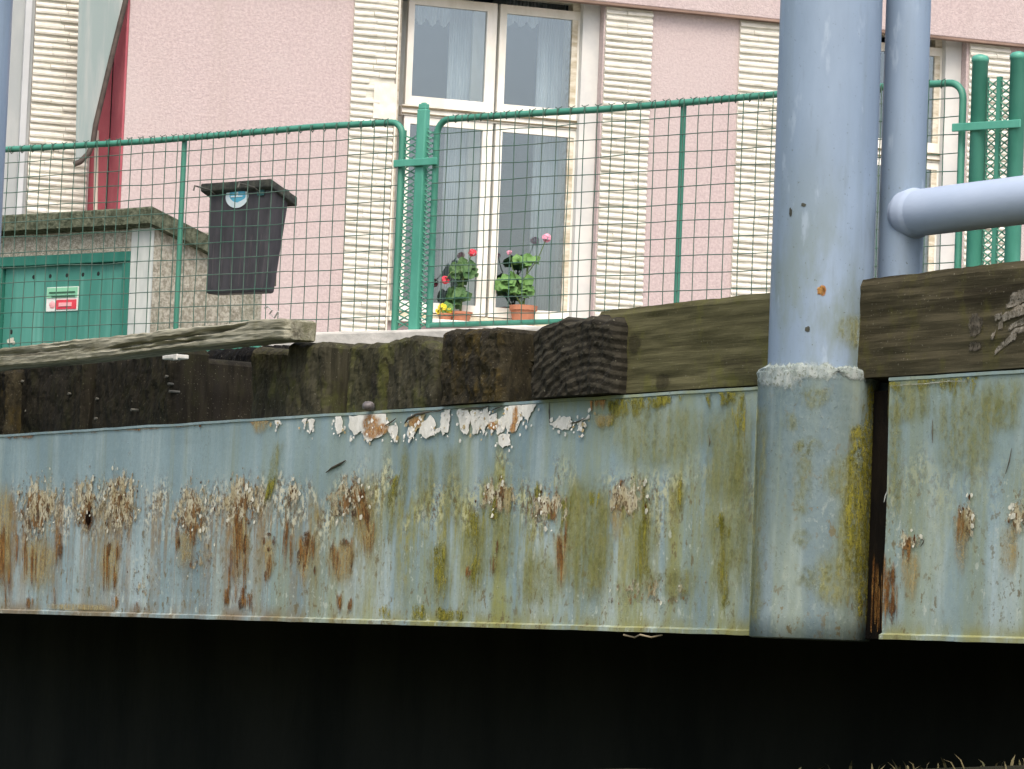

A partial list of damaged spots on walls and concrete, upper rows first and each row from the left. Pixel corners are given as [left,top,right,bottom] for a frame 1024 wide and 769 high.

peeling [298,418,315,440]
peeling [332,404,539,452]
peeling [549,408,596,438]
water stain [595,395,684,427]
rust [0,492,119,611]
rust [224,475,250,610]
rust [263,511,315,581]
rust [329,479,374,579]
water stain [412,545,463,620]
water stain [635,500,649,582]
water stain [844,384,878,620]
rust [870,538,917,633]